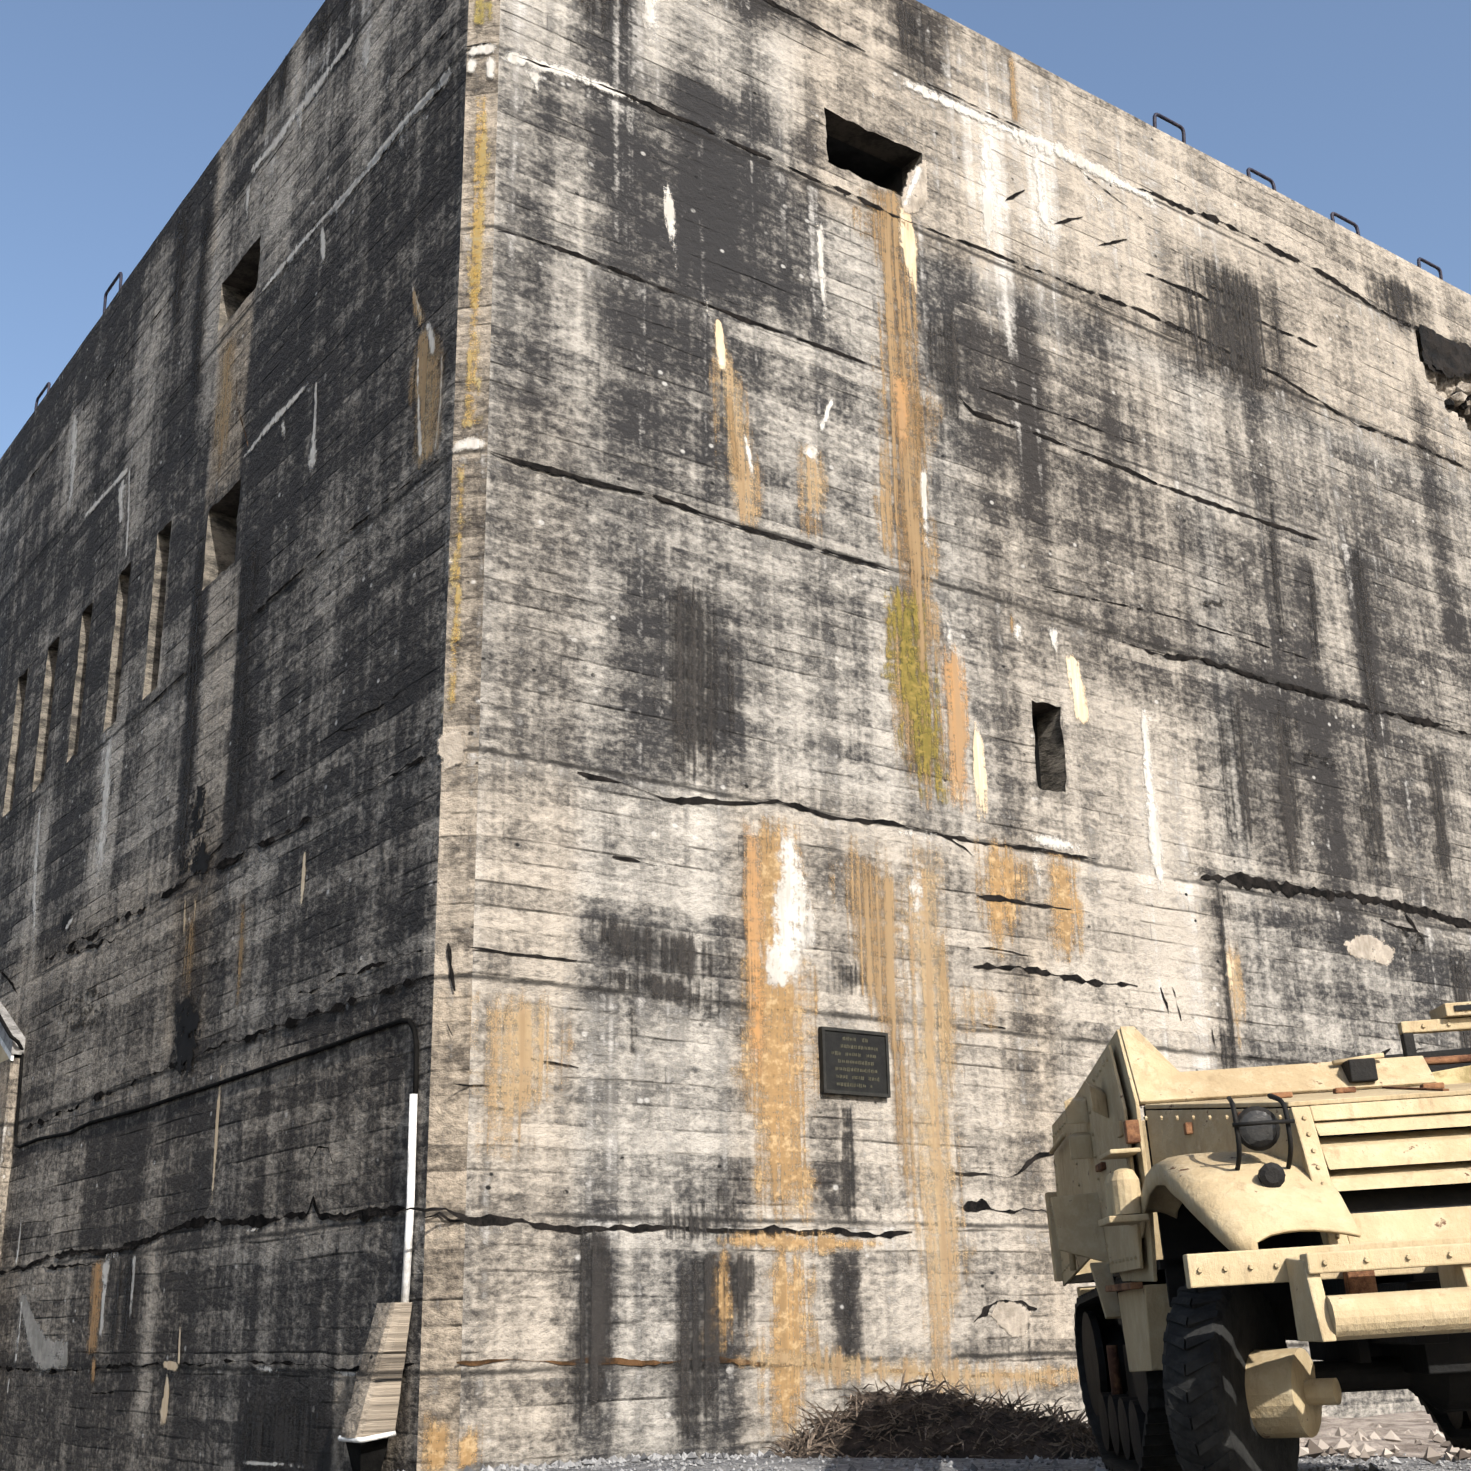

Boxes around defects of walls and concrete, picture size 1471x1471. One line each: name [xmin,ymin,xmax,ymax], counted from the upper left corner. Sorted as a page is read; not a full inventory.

water stain [246,0,371,216]
water stain [264,44,625,288]
rust [409,287,443,465]
rust [709,319,761,525]
rust [853,190,988,819]
spalling [1416,324,1471,431]
crack [1201,872,1471,938]
water stain [171,993,222,1080]
crack [0,1146,913,1275]
rust [711,819,1084,1438]
crack [950,1152,1054,1214]